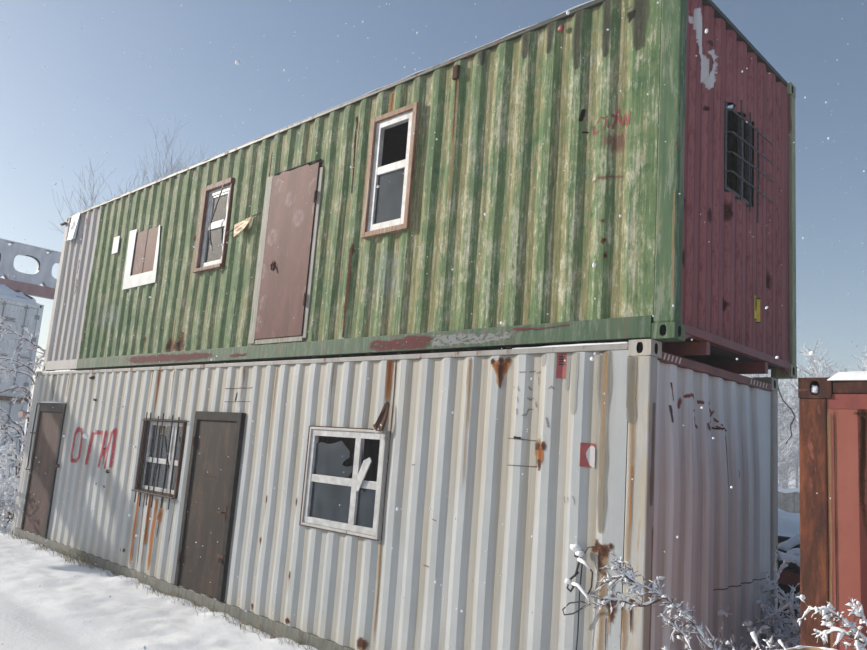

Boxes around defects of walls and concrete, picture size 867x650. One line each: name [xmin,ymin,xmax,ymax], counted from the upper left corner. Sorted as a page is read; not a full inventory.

damp [572,11,583,70]
damp [602,0,611,57]
damp [632,0,649,51]
peeling [689,7,718,90]
rust [165,319,184,351]
peeling [369,323,569,352]
rust [491,357,511,387]
rust [535,439,546,471]
rust [855,411,867,532]
rust [120,492,175,571]
rust [591,540,635,650]